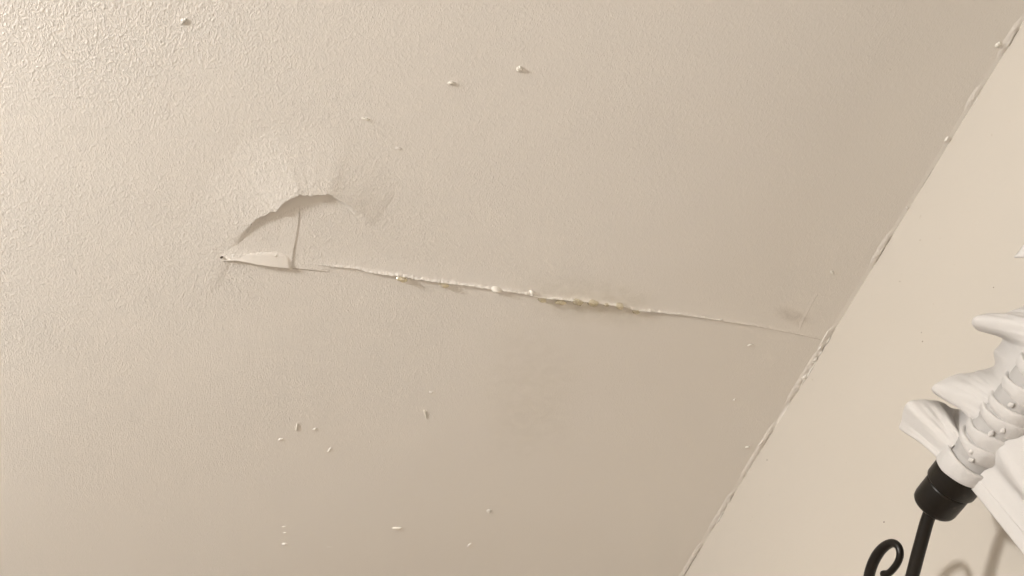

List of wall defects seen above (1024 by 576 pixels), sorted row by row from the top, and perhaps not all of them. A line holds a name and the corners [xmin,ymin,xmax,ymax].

crack [220,13,1024,576]